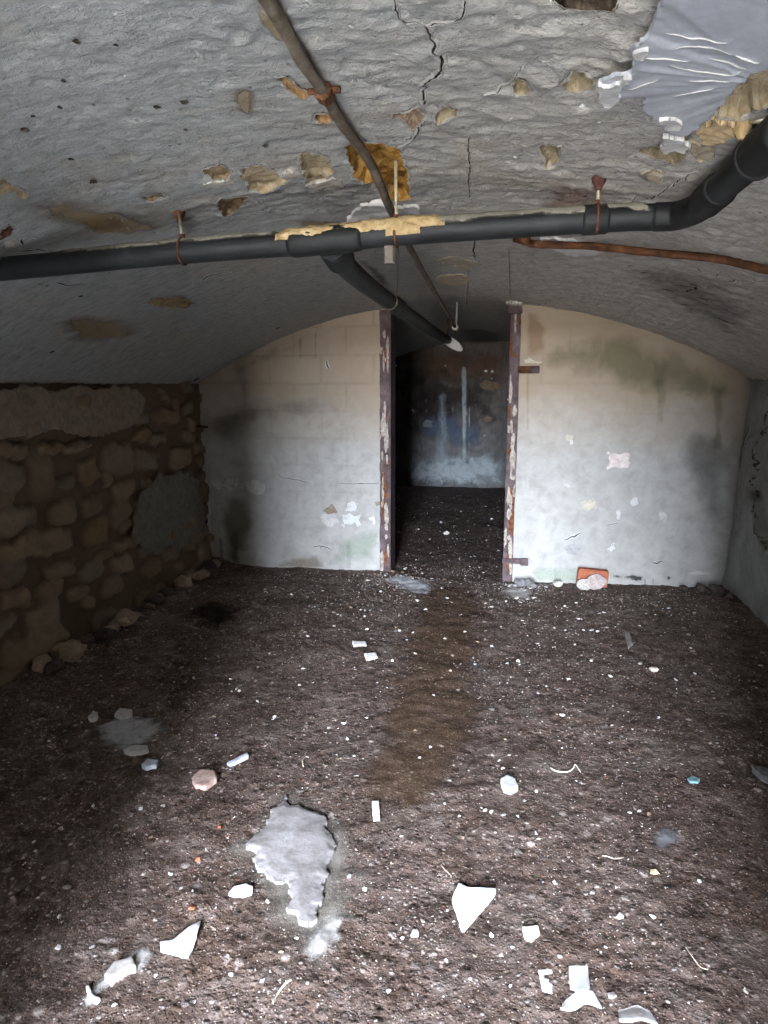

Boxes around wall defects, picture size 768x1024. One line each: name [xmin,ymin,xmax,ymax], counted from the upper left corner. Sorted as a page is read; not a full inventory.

crack [392,0,469,148]
peeling [552,0,768,184]
damp [51,205,153,232]
flaking render [200,140,420,223]
peeling [320,477,389,571]
corrosion [381,460,389,519]
damp [406,367,501,484]
peeling [606,451,631,470]